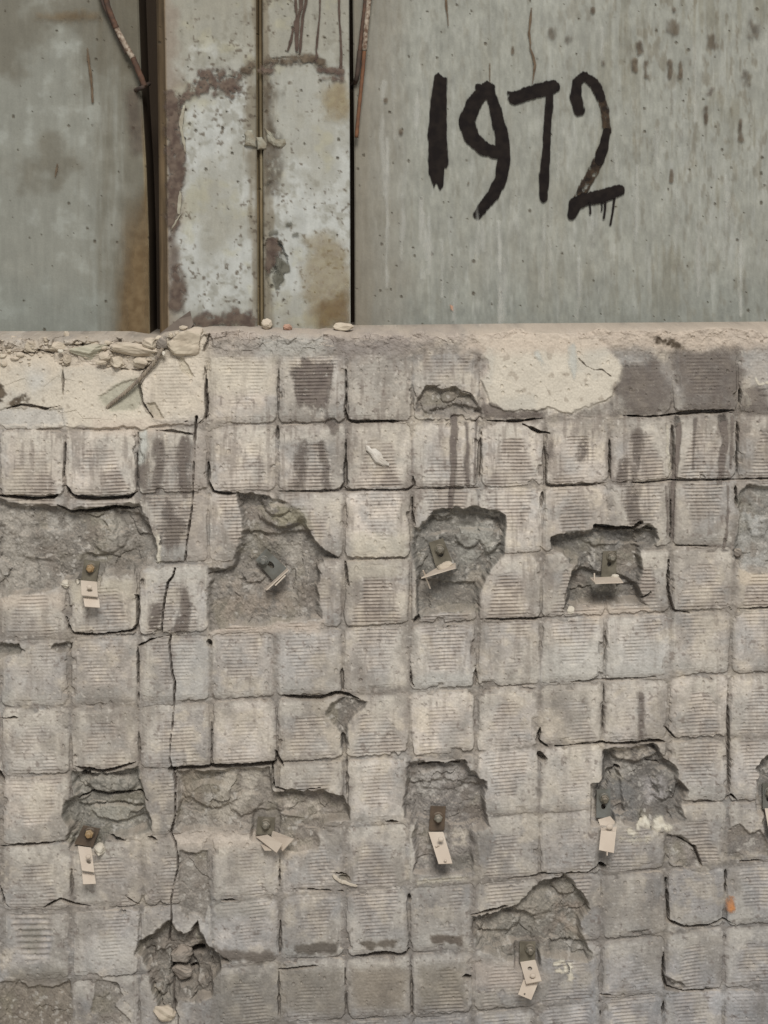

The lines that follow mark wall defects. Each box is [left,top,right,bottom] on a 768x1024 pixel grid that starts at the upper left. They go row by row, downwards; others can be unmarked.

leakage [164,0,345,240]
leakage [168,264,186,311]
leakage [192,307,258,327]
leakage [265,222,298,289]
spalling [0,498,158,599]
spalling [206,491,341,632]
spalling [410,505,507,619]
spalling [550,523,660,612]
crack [160,379,209,1024]
spalling [174,762,352,853]
spalling [401,759,492,877]
spalling [591,739,700,871]